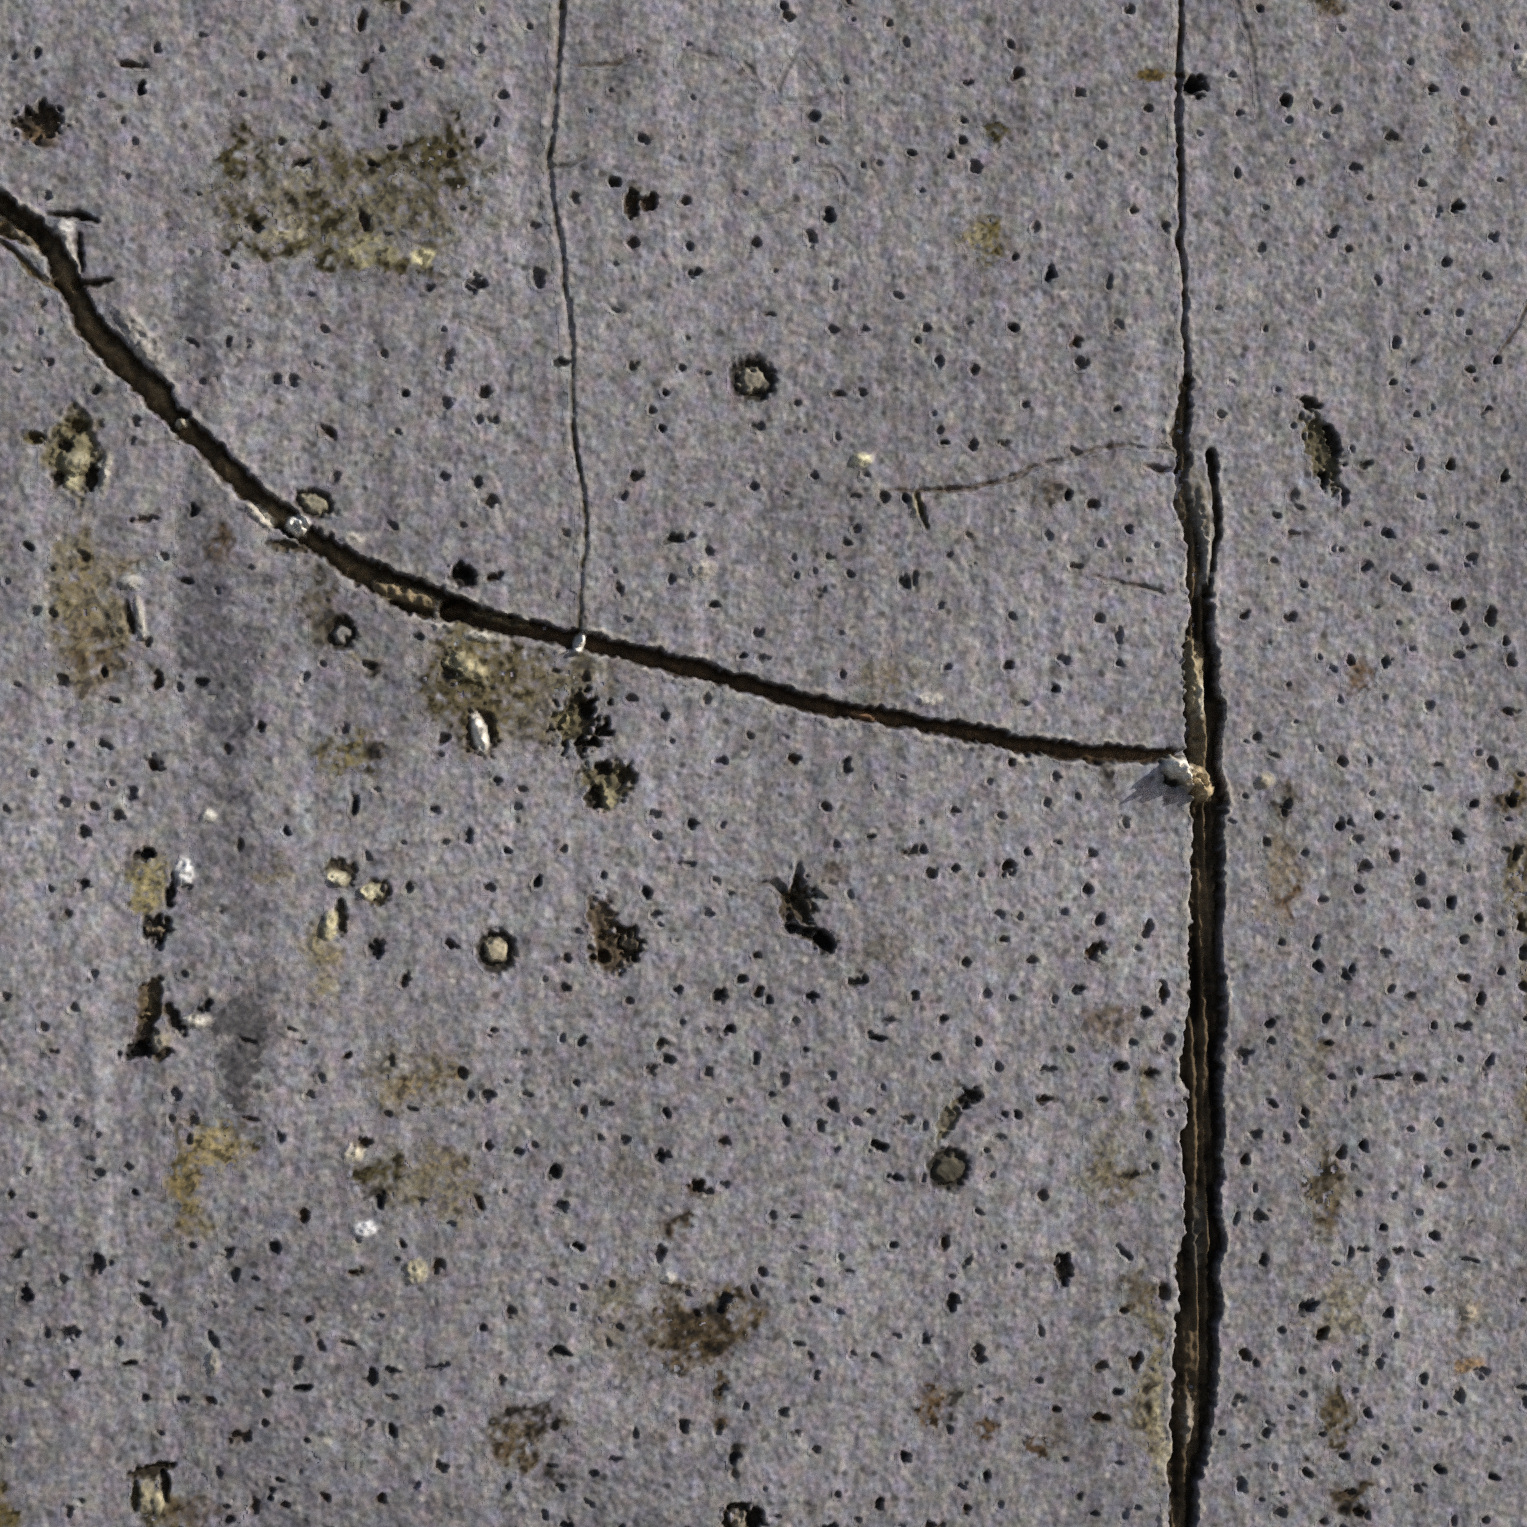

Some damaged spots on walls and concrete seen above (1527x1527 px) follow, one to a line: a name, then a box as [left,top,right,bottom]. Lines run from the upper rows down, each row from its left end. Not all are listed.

crack [1232,0,1263,121]
crack [0,0,1179,773]
crack [1496,301,1527,356]
crack [884,0,1237,1527]
crack [762,1497,820,1511]